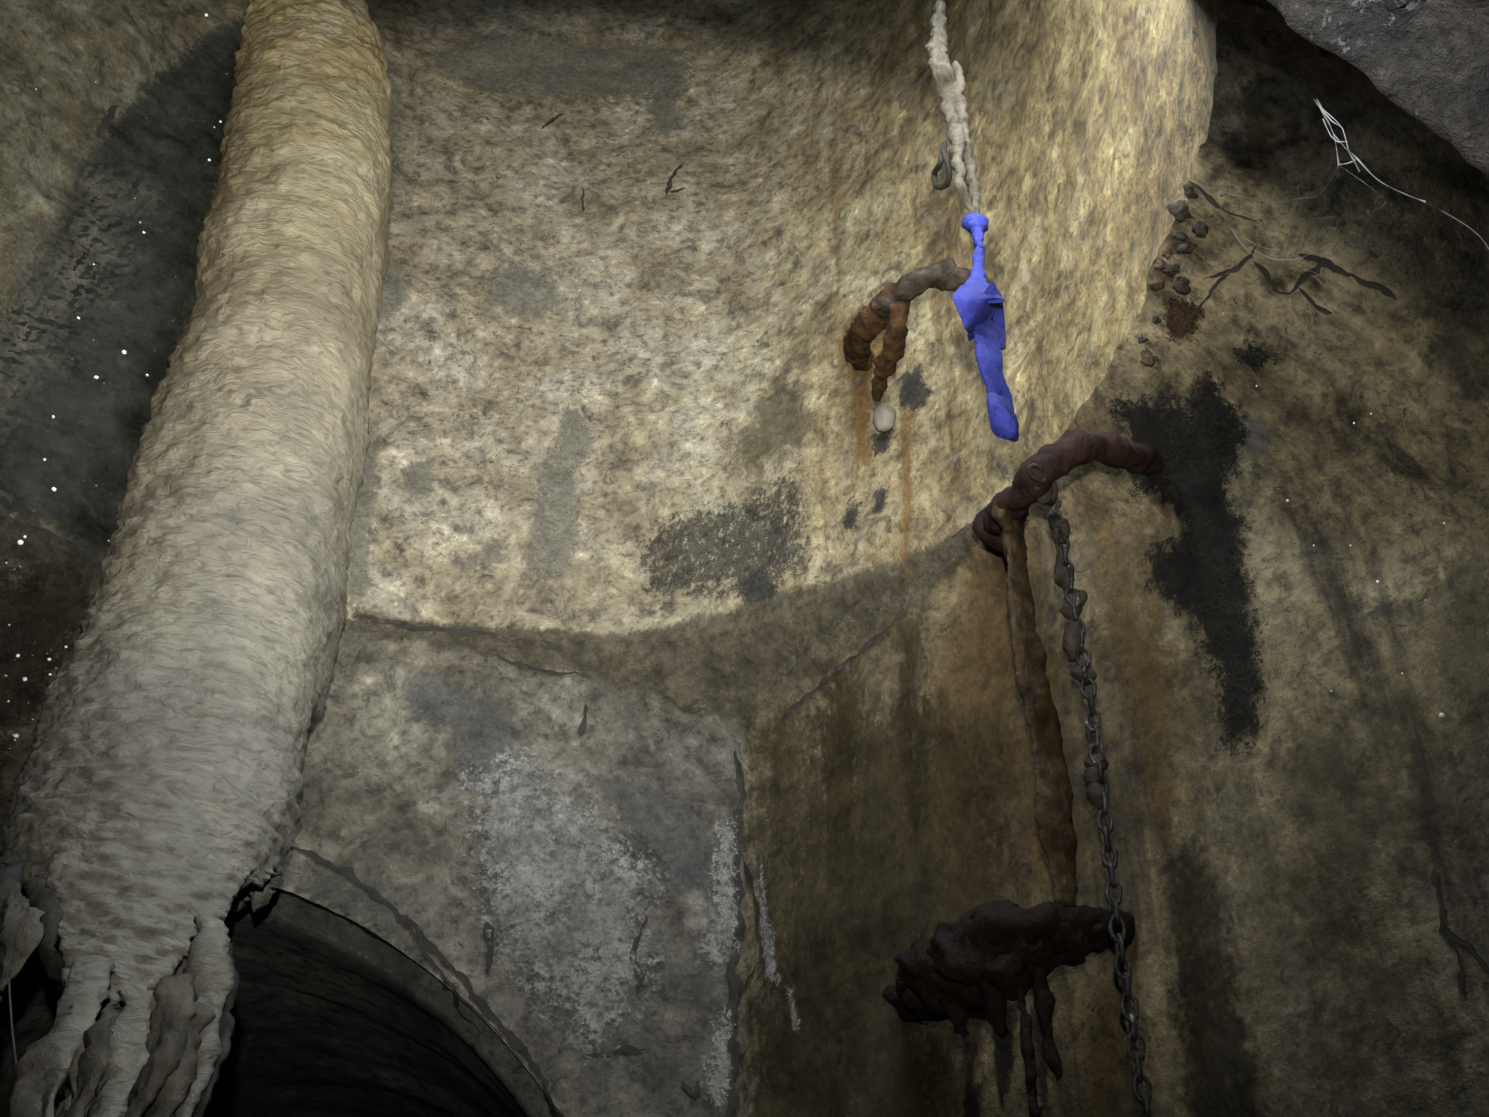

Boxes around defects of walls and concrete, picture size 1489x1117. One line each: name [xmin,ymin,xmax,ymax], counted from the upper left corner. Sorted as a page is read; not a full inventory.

crack [1184,181,1397,330]
corrosion [838,300,911,465]
water stain [1233,329,1279,376]
corrosion [900,408,915,577]
water stain [345,376,1020,1117]
water stain [1107,371,1489,1117]